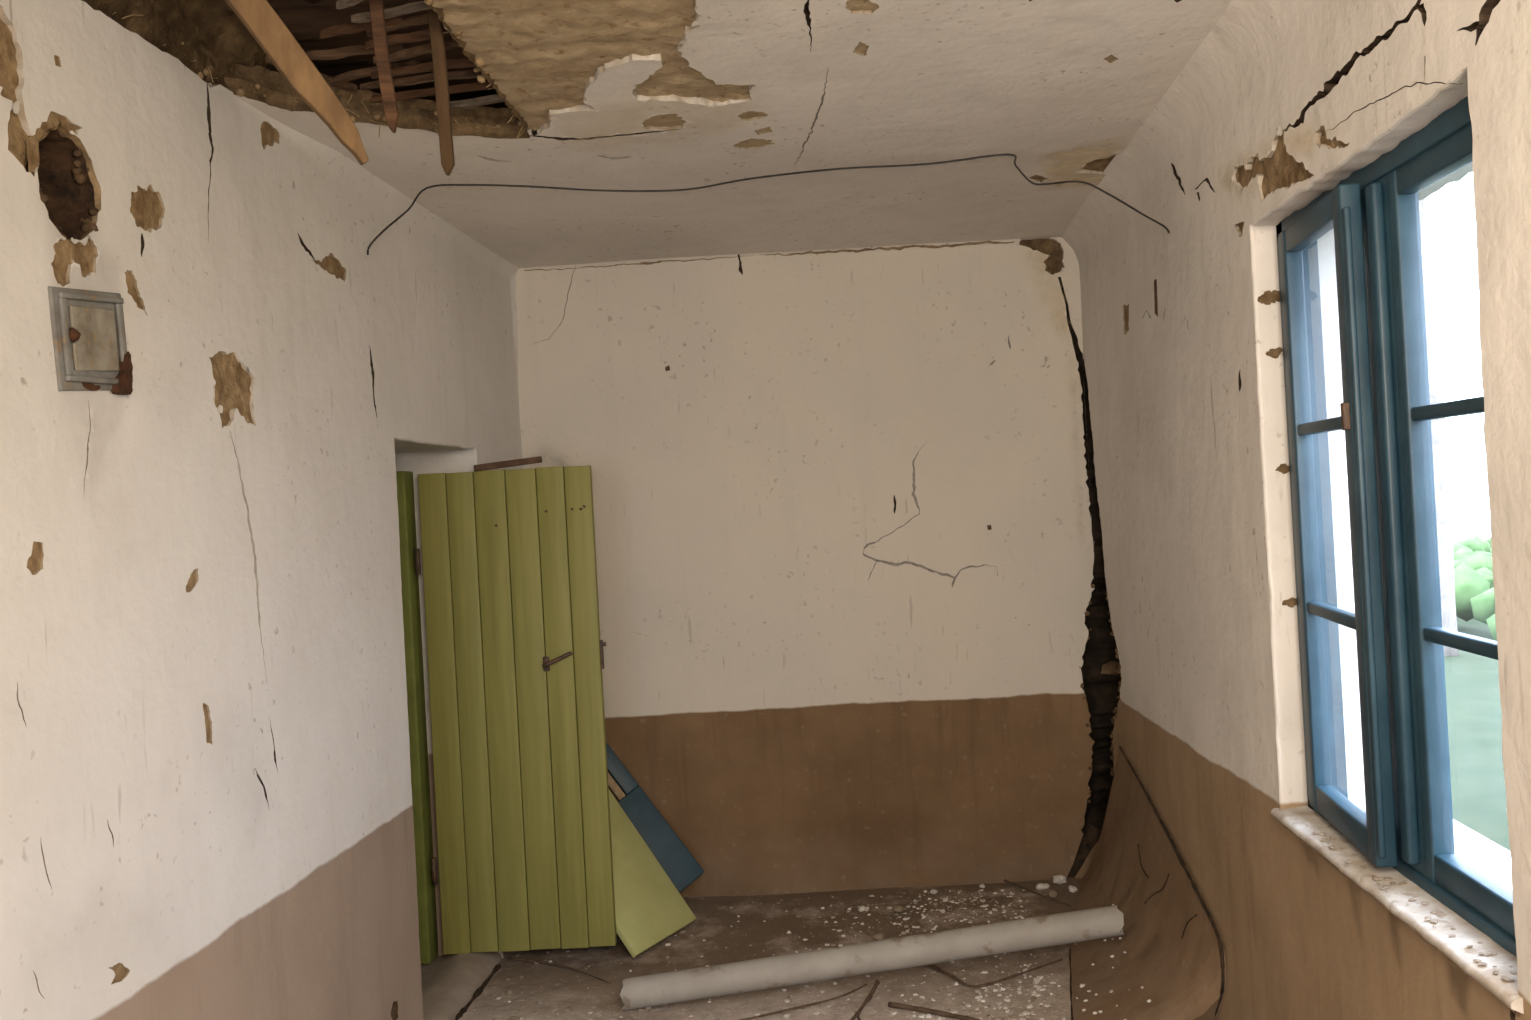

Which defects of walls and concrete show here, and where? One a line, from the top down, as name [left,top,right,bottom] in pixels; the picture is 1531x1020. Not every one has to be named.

spalling [527,0,775,149]
crack [1283,0,1501,136]
spalling [0,5,101,286]
spalling [260,121,280,150]
spalling [1232,126,1314,202]
spalling [1315,125,1349,149]
spalling [130,184,165,233]
spalling [313,253,347,282]
spalling [209,351,257,428]
crack [863,438,998,587]
crack [1058,277,1122,878]